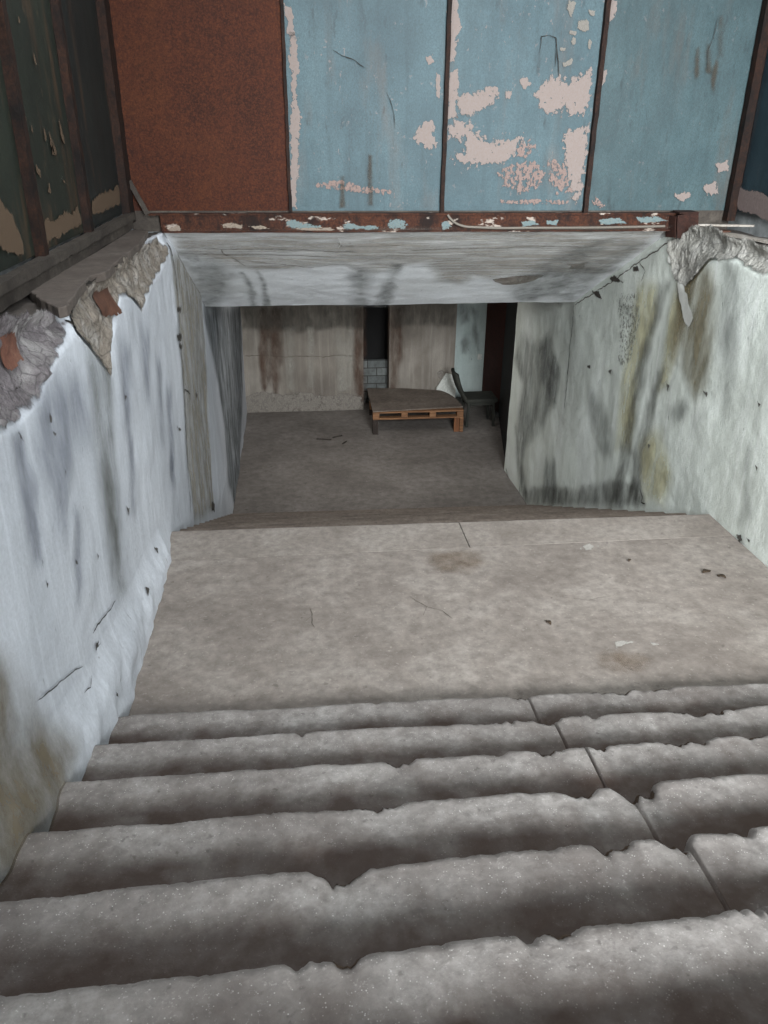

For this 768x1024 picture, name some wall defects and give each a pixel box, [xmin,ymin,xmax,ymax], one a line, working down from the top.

peeling [169,0,668,285]
peeling [0,199,24,257]
peeling [44,186,120,245]
spalling [0,237,169,439]
damp [623,292,654,442]
damp [667,272,713,391]
spalling [667,225,768,328]
crack [39,601,115,700]